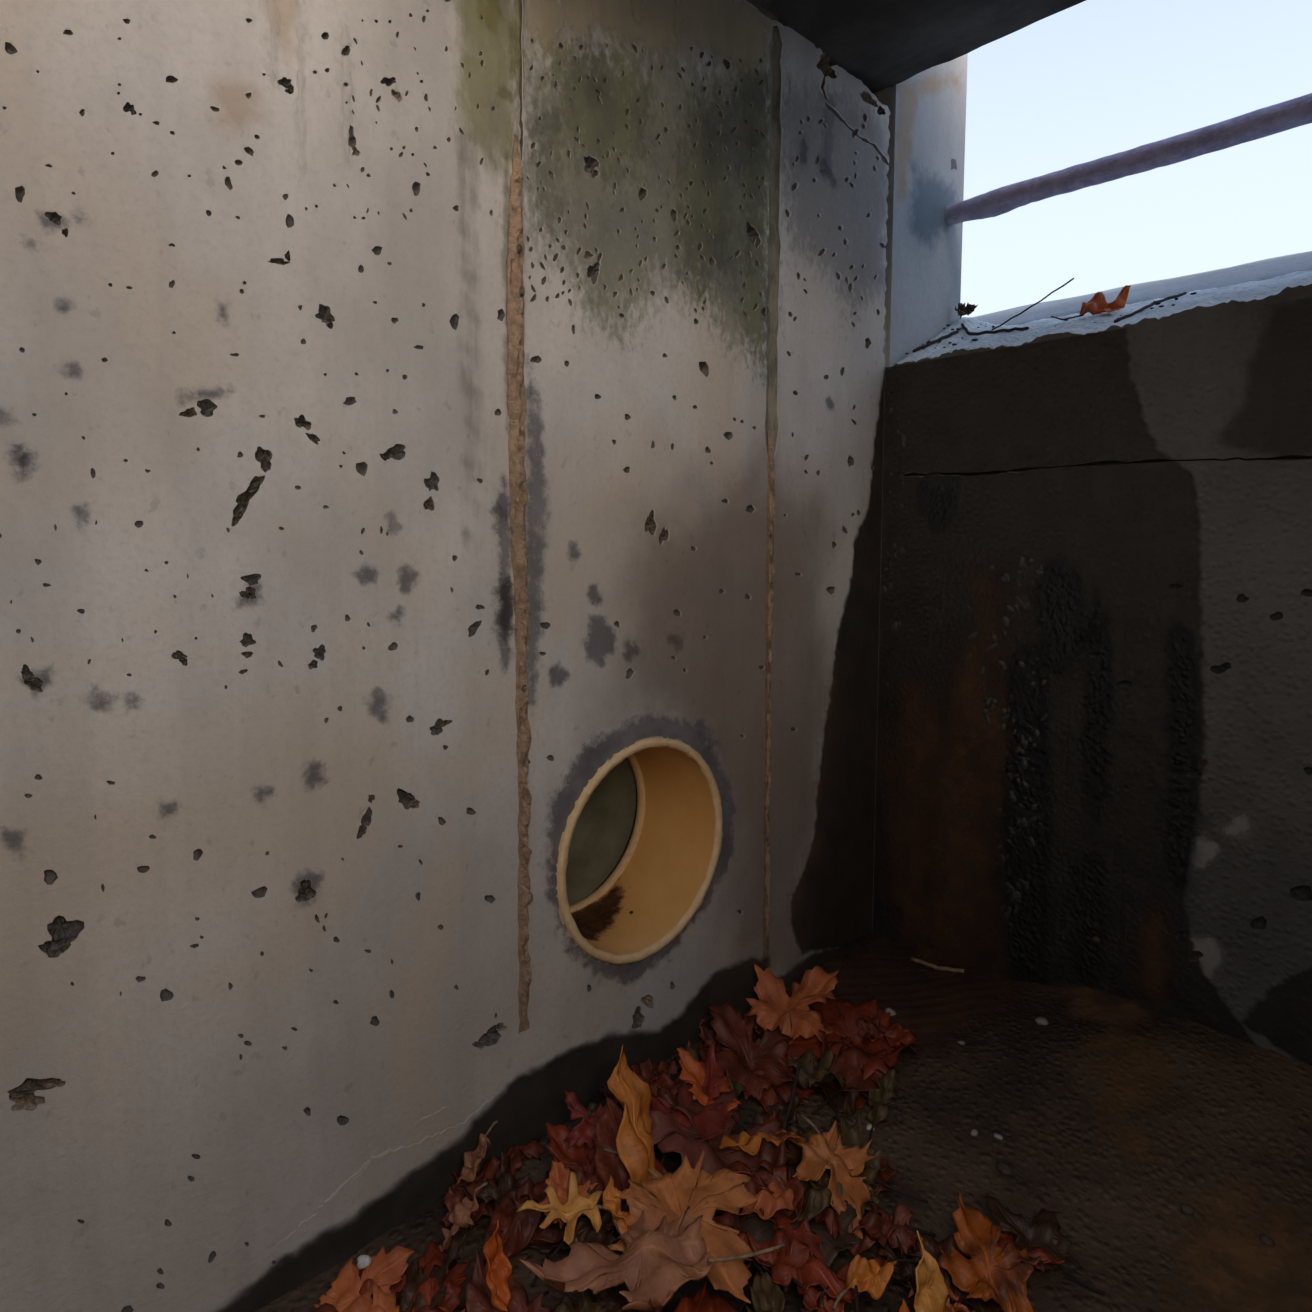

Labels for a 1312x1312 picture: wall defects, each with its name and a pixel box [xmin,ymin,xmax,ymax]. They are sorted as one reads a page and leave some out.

damp [358,568,375,583]
damp [401,568,417,591]
damp [493,381,568,704]
damp [586,586,638,666]
damp [781,328,1312,1066]
crack [903,454,1312,477]
damp [547,716,736,984]
damp [219,958,769,1312]